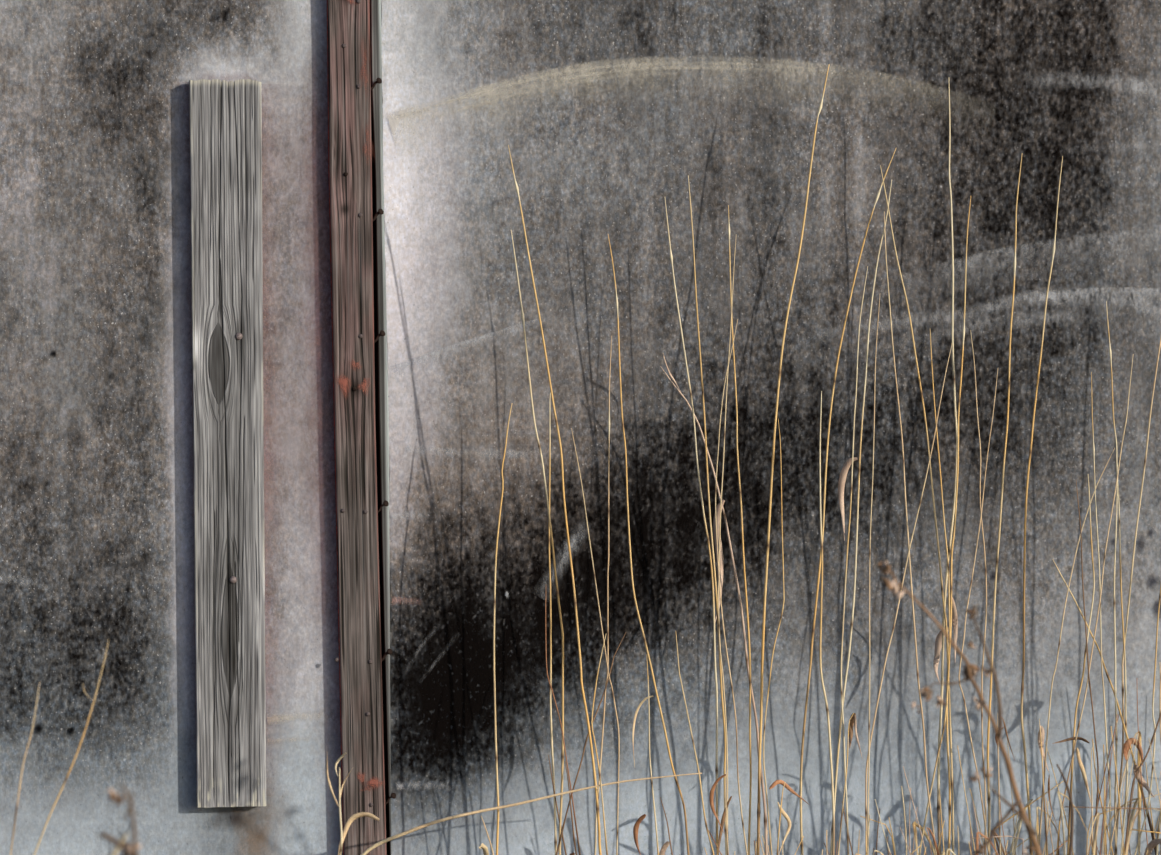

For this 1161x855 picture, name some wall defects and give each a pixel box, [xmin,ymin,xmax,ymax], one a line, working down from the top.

water stain [3,554,149,726]
water stain [390,0,1122,784]